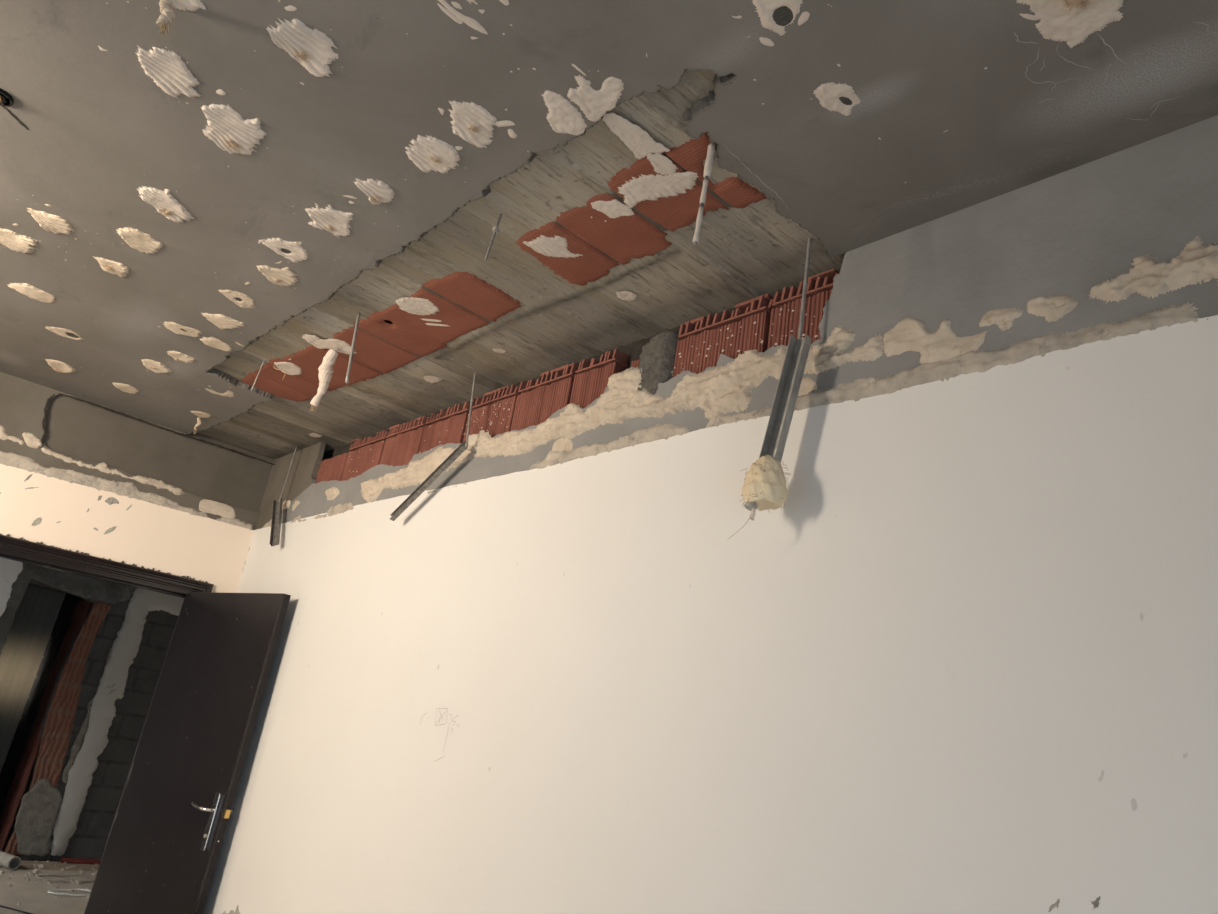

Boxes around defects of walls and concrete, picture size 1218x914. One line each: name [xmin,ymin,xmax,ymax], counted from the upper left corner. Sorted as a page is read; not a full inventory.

spalling [43,115,604,512]
spalling [682,73,737,168]